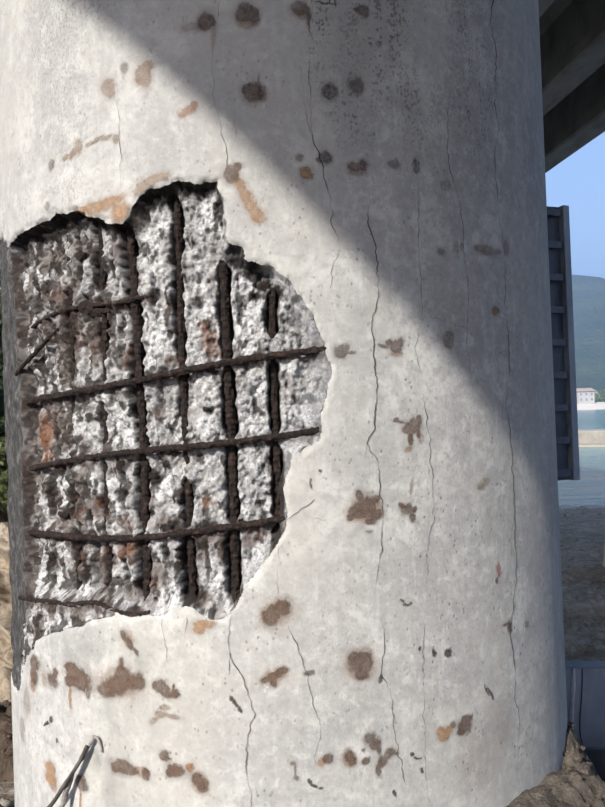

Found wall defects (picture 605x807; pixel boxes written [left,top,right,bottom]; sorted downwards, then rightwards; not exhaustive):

crack [306,115,328,189]
corrosion [224,162,264,222]
crack [365,215,383,512]
spalling [0,181,332,691]
corrosion [393,415,422,451]
corrosion [347,490,382,524]
crack [502,391,520,727]
corrosion [262,600,290,626]
corrosion [30,656,39,691]
corrosion [47,658,180,721]
corrosion [121,631,138,656]
corrosion [348,652,373,680]